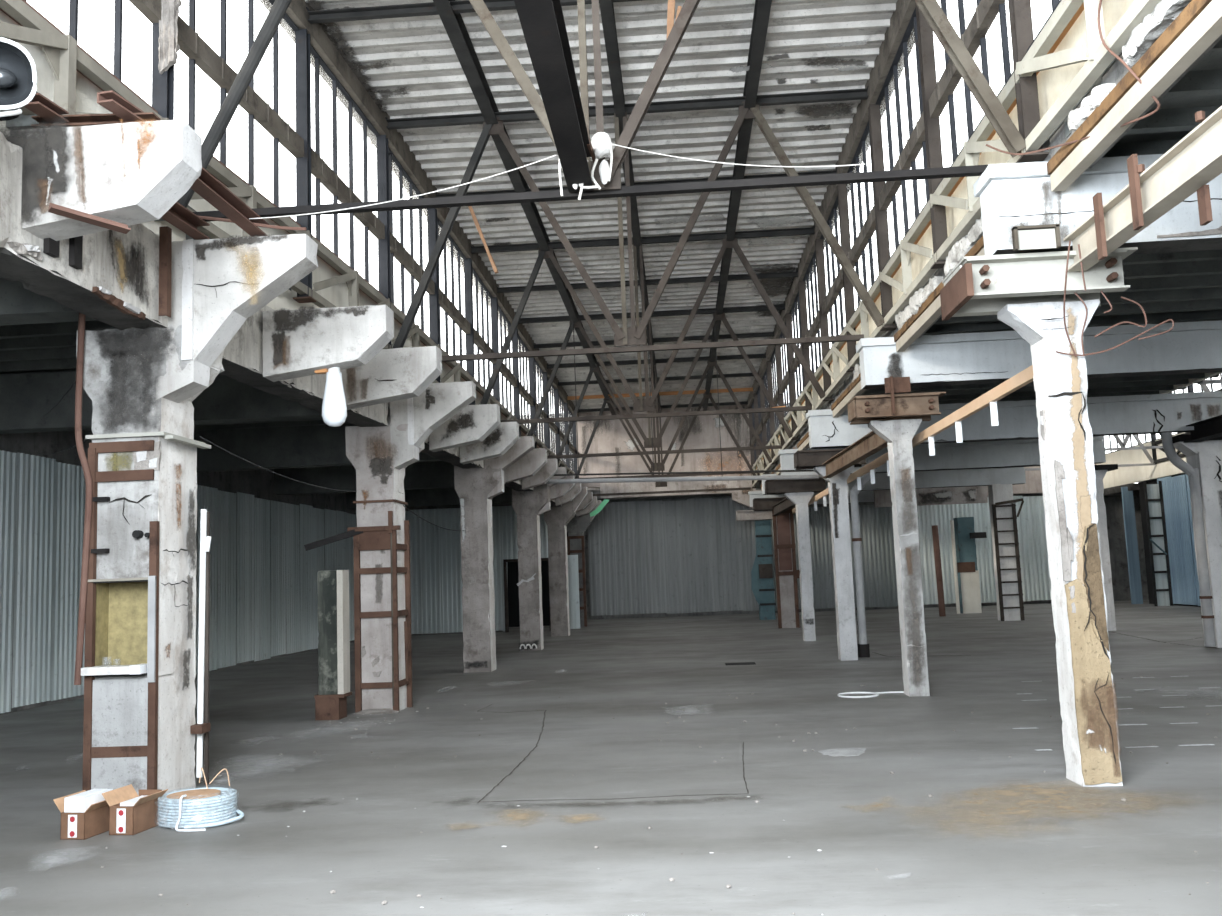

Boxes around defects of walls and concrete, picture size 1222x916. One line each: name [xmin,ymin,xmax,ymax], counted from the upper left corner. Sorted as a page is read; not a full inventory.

water stain [272,306,369,367]
water stain [98,328,170,432]
crack [1153,410,1165,435]
crack [1214,456,1222,482]
crack [111,494,152,525]
flaking render [1054,460,1122,785]